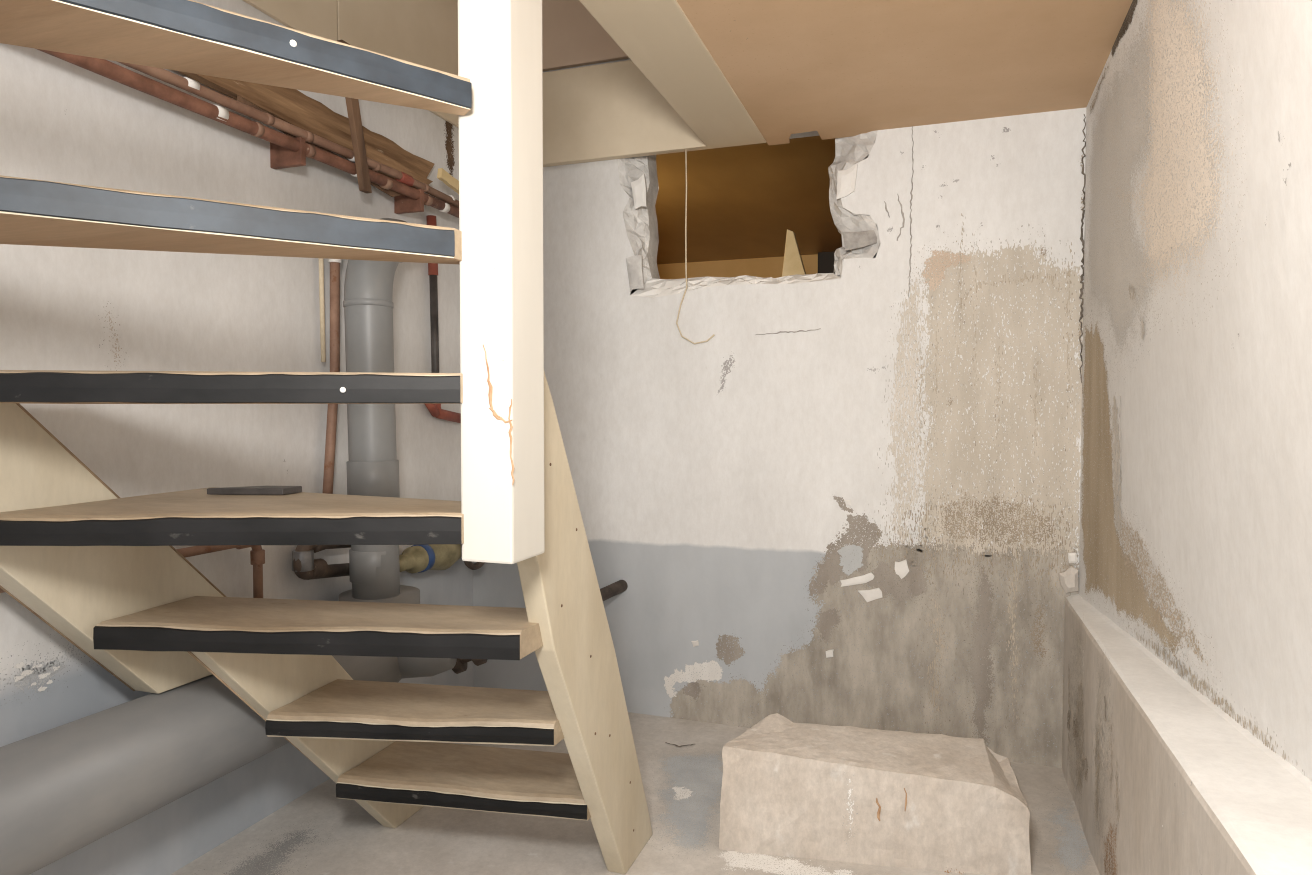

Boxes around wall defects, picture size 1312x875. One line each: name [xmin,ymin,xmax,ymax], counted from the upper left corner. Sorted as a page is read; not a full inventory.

flaking render [617,130,893,298]
water stain [874,2,1293,762]
peeling [664,496,1079,768]